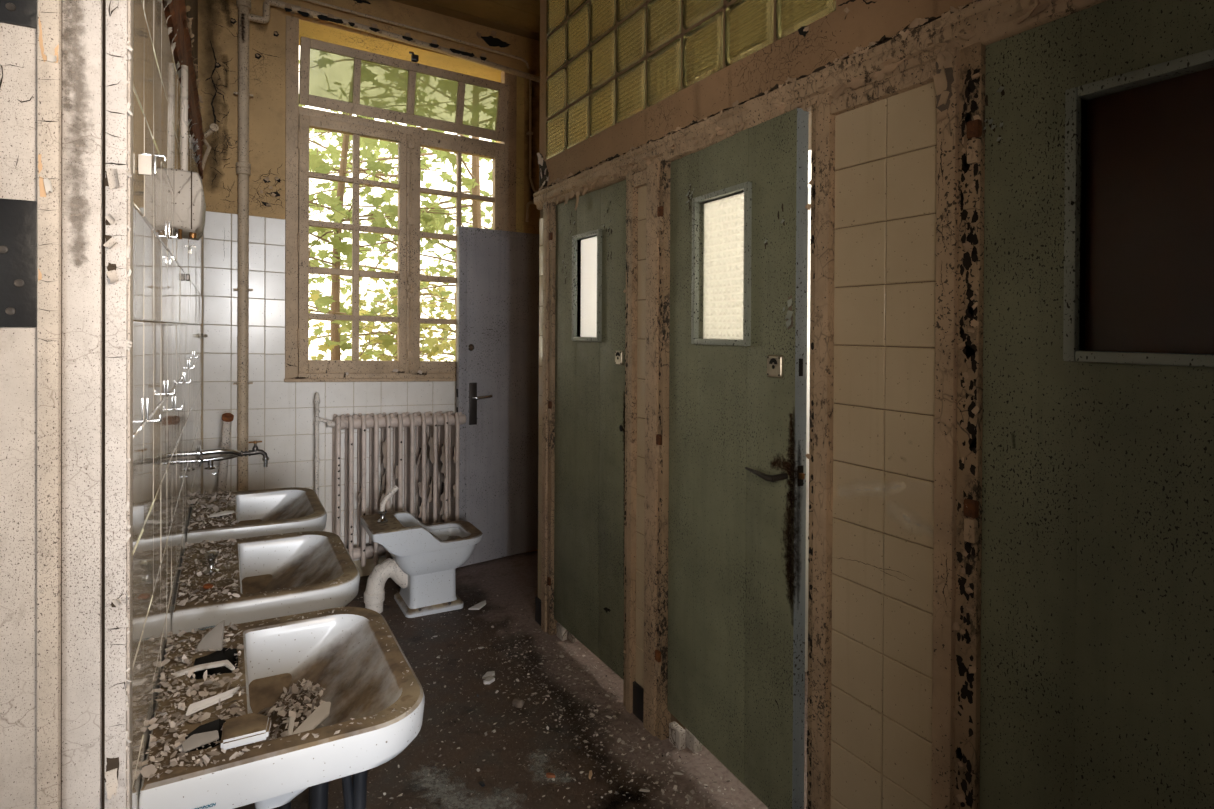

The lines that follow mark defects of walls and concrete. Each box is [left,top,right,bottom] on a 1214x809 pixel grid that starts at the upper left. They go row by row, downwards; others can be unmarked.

peeling [104,214,132,285]
peeling [105,151,132,200]
crack [201,20,285,207]
peeling [284,3,382,34]
peeling [402,31,511,62]
peeling [537,153,620,234]
peeling [927,26,1005,476]
leakage [787,414,800,625]
peeling [805,400,814,600]
peeling [951,532,976,809]